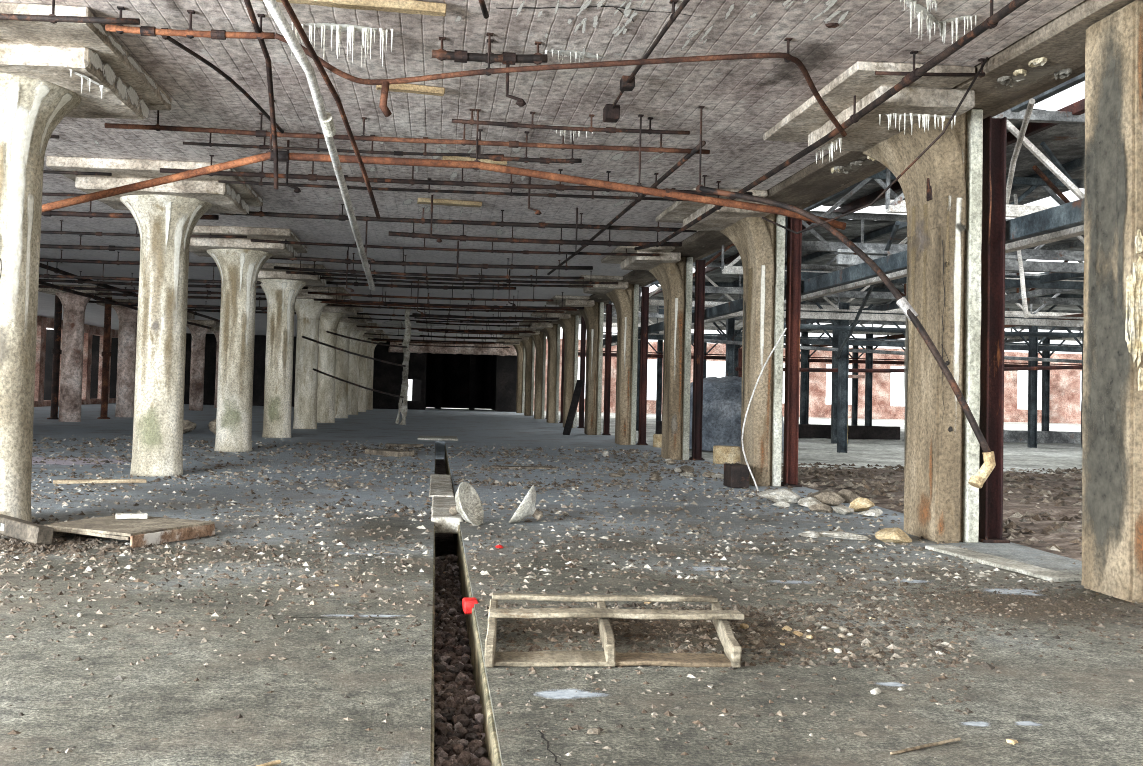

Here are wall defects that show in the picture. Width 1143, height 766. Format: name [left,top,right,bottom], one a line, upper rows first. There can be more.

efflorescence [292,22,394,68]
damp [879,113,956,132]
crack [538,730,561,766]